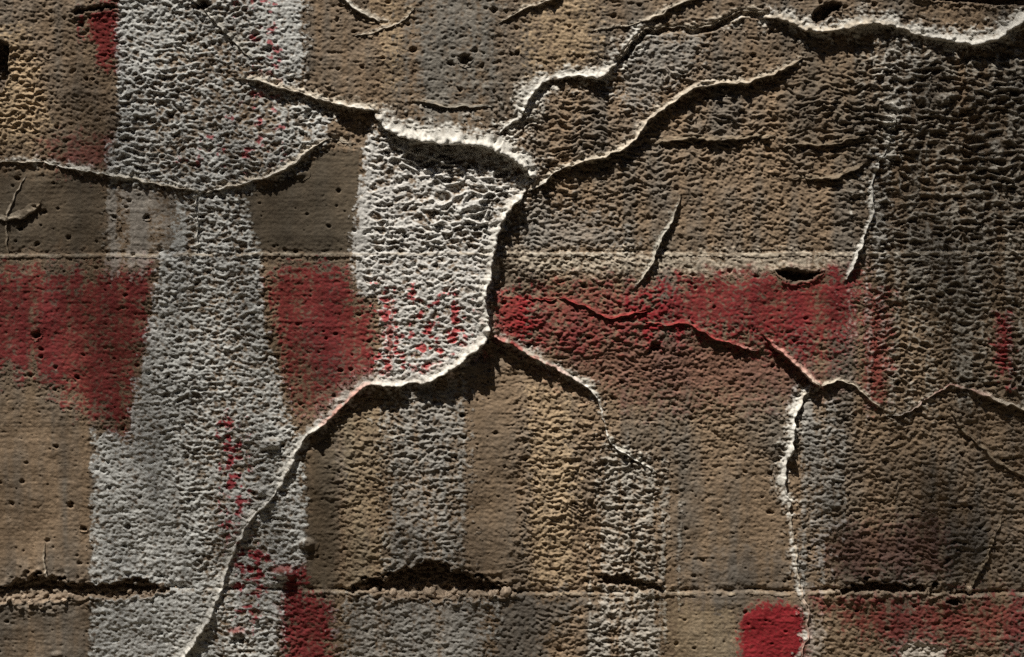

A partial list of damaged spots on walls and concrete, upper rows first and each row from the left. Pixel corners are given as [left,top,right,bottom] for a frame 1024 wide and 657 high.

crack [180,0,255,60]
crack [233,0,1024,189]
crack [0,133,355,254]
crack [655,100,897,281]
crack [170,51,807,657]
crack [528,194,1024,657]
crack [42,544,51,580]